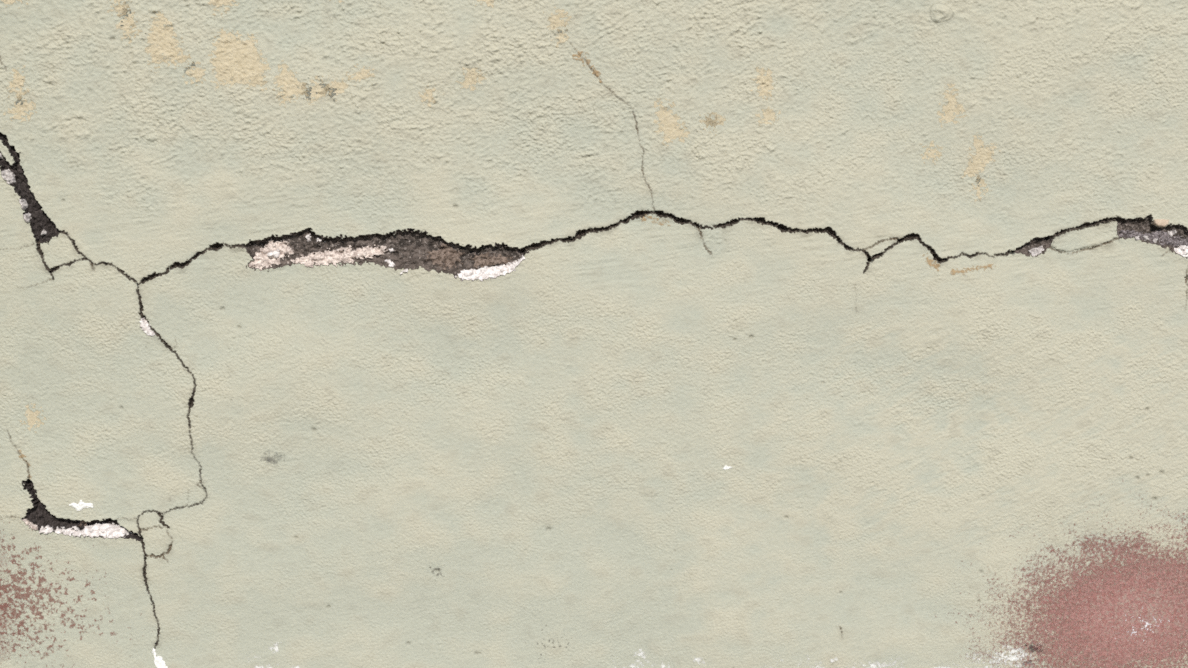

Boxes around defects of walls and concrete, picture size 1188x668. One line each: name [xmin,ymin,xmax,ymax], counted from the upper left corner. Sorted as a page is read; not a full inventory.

spalling [0,132,60,243]
spalling [242,228,529,281]
crack [523,161,1012,273]
spalling [1011,236,1053,257]
crack [1049,217,1121,253]
spalling [1115,215,1188,258]
crack [35,230,243,646]
spalling [22,479,143,541]